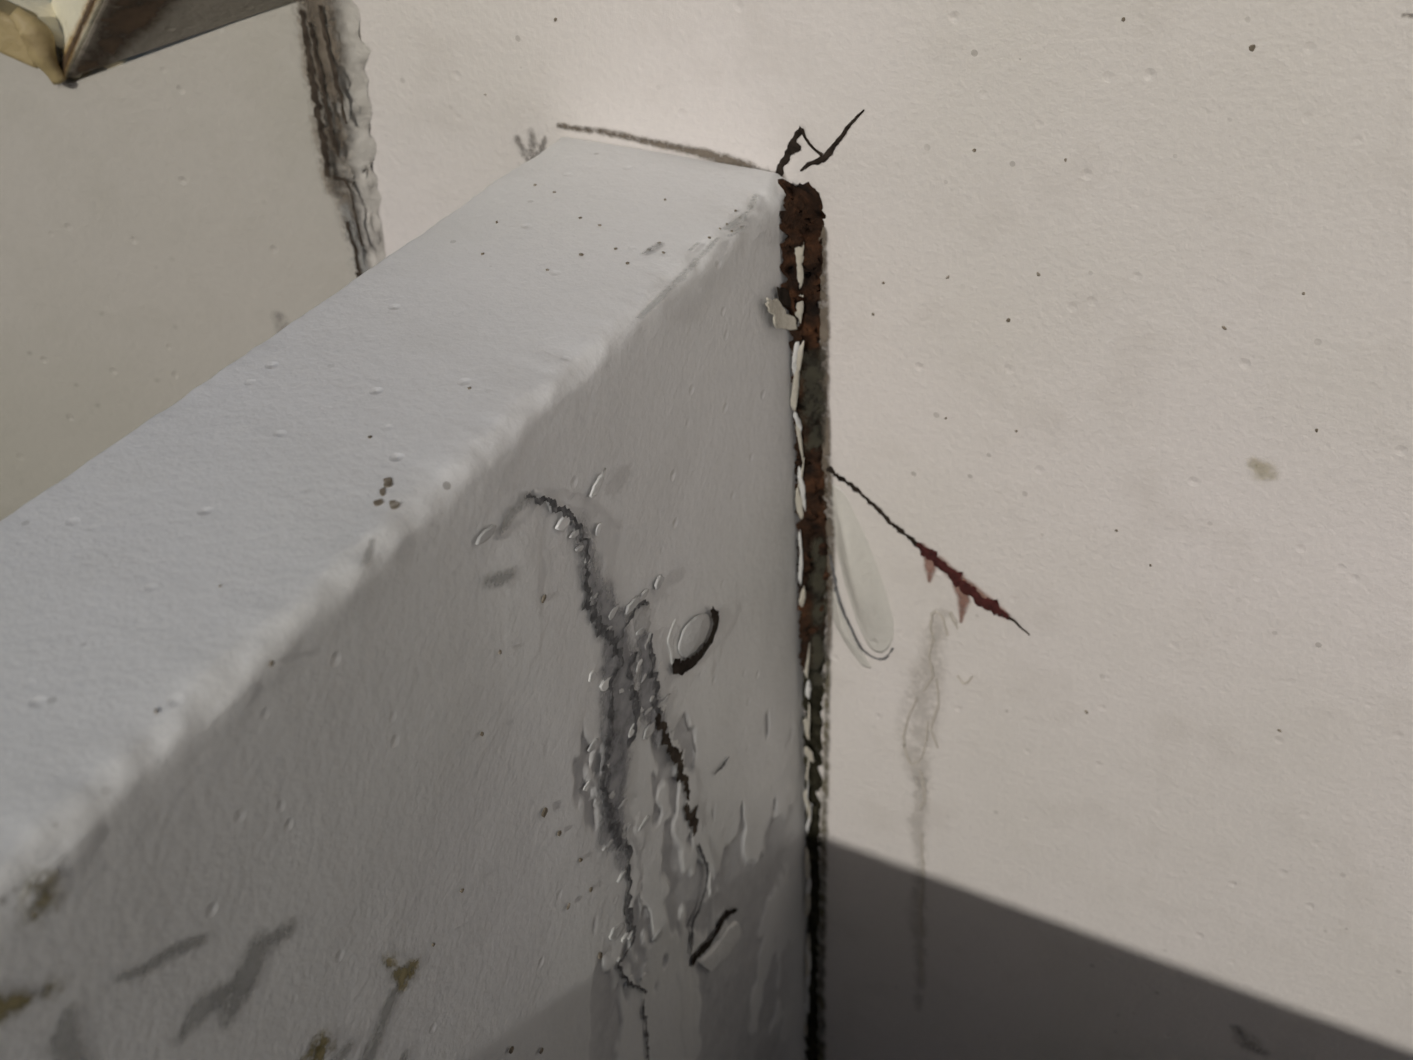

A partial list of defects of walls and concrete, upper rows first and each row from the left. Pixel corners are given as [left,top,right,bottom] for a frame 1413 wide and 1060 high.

rust [58,0,173,85]
crack [298,5,364,277]
crack [557,109,864,177]
rust [778,178,830,671]
crack [826,466,1030,635]
peeling [475,468,805,1060]